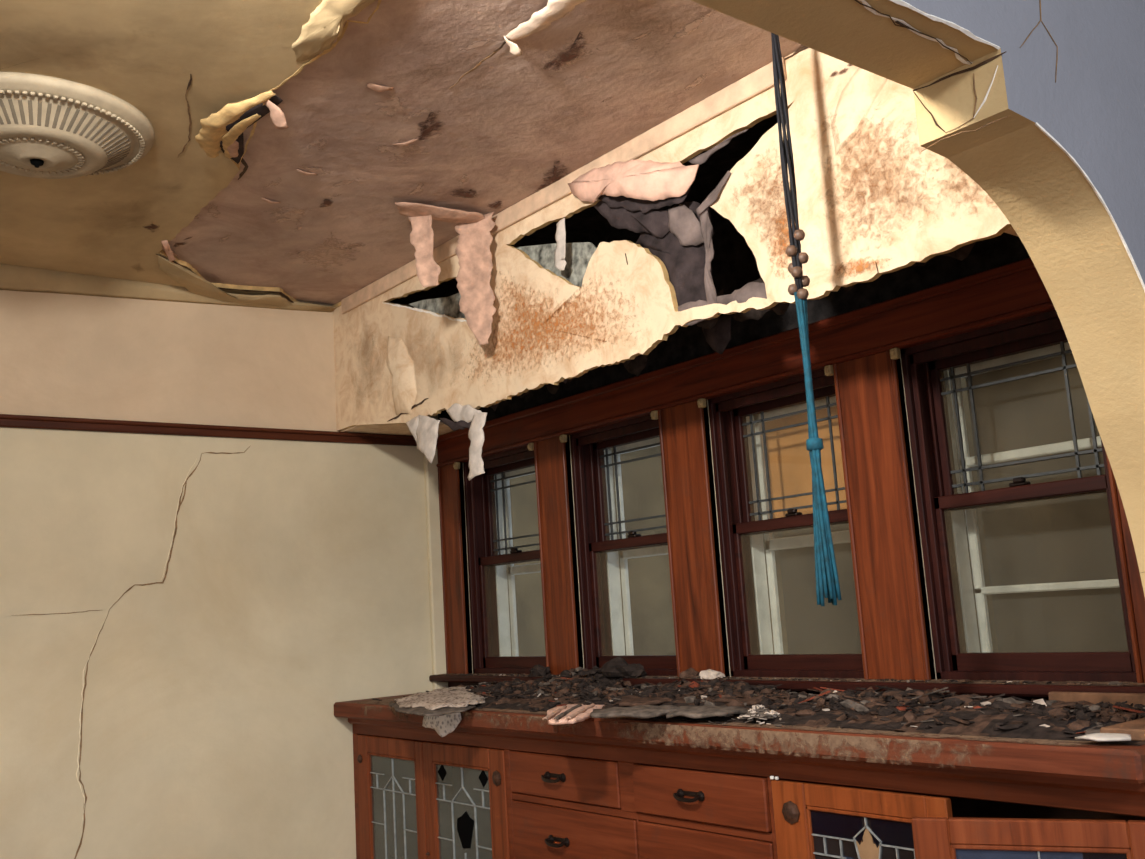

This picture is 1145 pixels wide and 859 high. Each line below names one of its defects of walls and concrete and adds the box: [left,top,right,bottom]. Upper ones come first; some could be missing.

crack [178,74,192,156]
spalling [156,0,804,345]
leakage [748,166,787,246]
leakage [836,134,913,223]
flaking render [890,0,1000,50]
crack [855,0,1058,152]
flaking render [1035,122,1145,292]
crack [27,446,250,859]